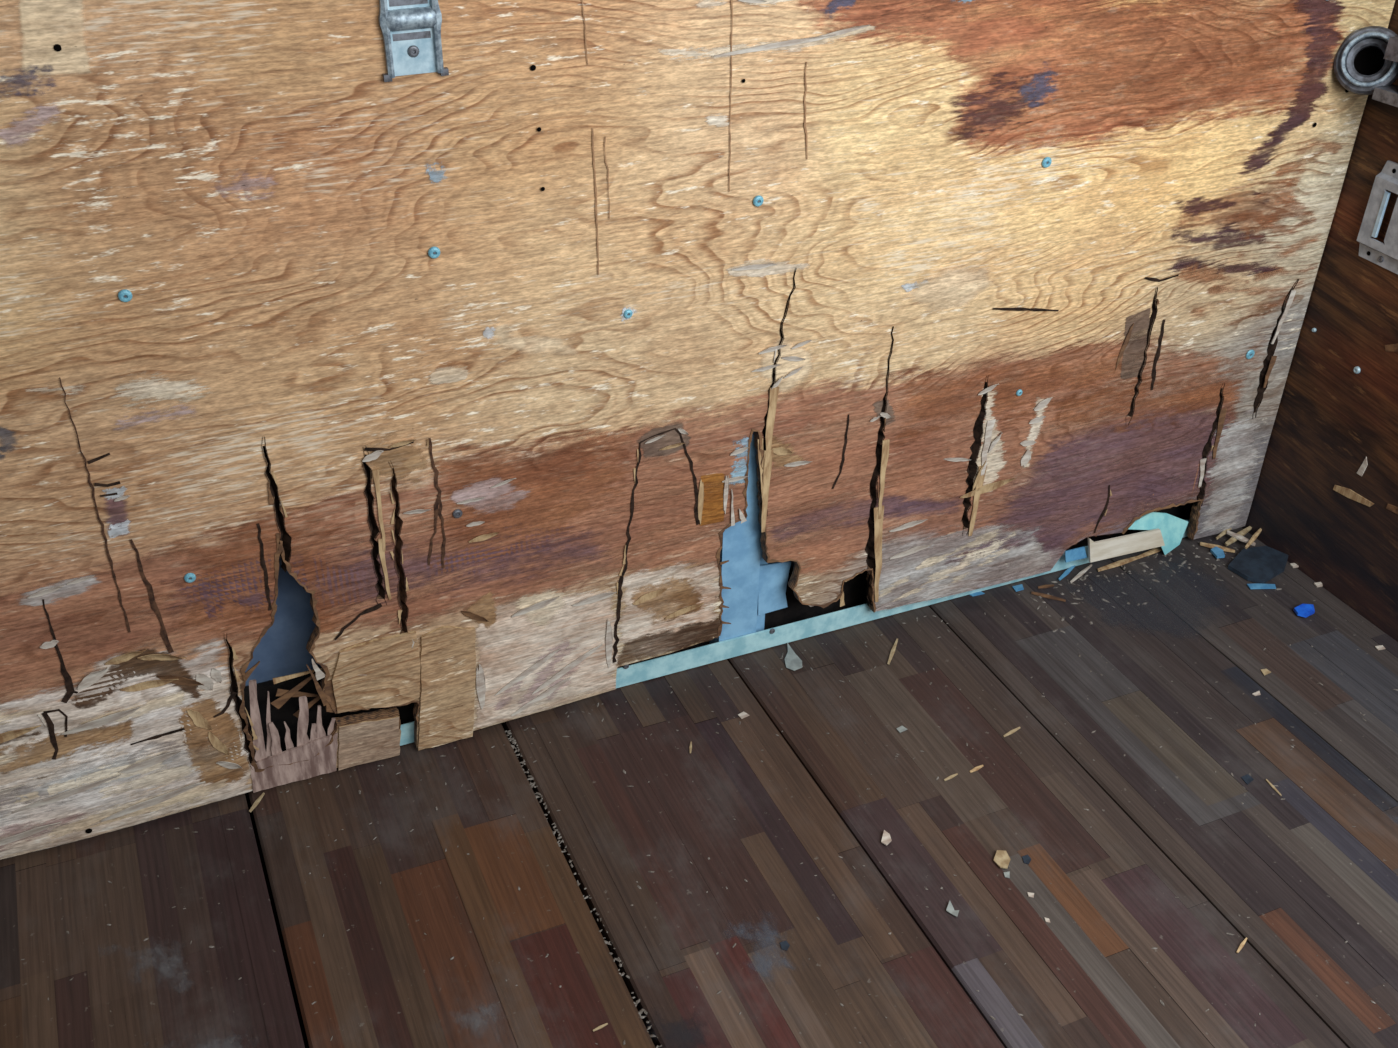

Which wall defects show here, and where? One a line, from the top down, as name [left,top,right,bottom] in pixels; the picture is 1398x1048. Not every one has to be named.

leakage [800,0,1345,303]
crack [256,442,292,611]
spalling [187,540,420,793]
crack [335,438,446,640]
peeling [461,611,489,622]
leakage [0,338,1262,697]
crack [613,428,700,663]
spalling [716,429,876,636]
crack [832,326,894,607]
crack [962,376,996,536]
hole [1122,499,1204,540]
crack [1194,279,1299,506]